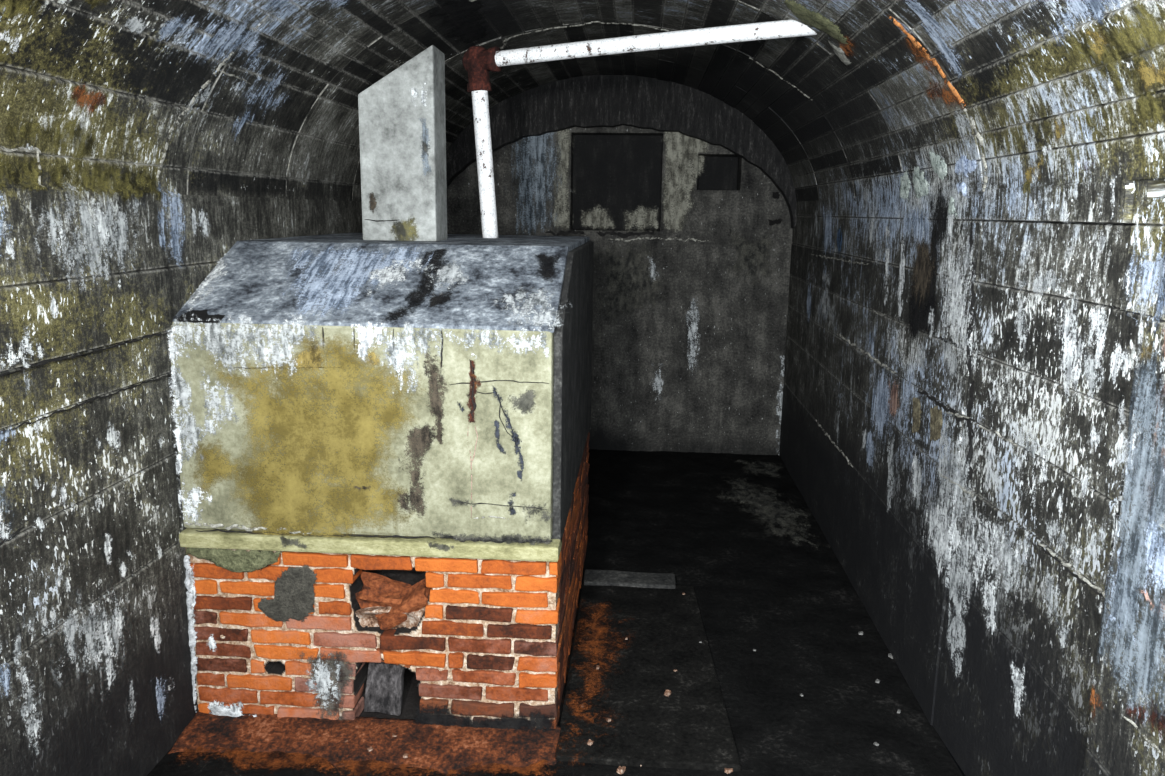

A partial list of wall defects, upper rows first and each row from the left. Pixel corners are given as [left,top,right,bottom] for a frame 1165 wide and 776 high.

crack [500,21,669,49]
damp [35,184,144,290]
damp [158,184,210,267]
damp [511,129,708,327]
damp [869,185,978,381]
damp [96,422,121,452]
damp [158,246,564,551]
corrosion [467,353,481,514]
damp [104,534,133,577]
spalling [355,571,431,630]
damp [911,421,1029,677]
damp [1010,661,1027,716]